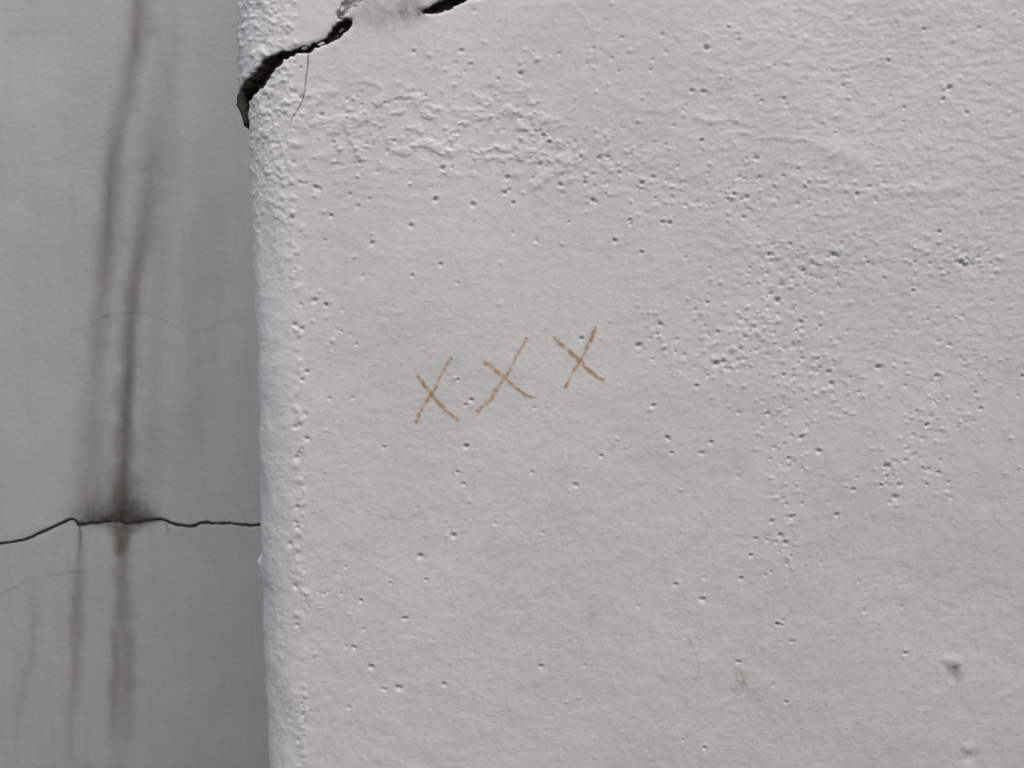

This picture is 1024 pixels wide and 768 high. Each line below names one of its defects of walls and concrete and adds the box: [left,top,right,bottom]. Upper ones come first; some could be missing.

crack [423,0,466,14]
crack [236,20,351,129]
crack [0,518,261,545]